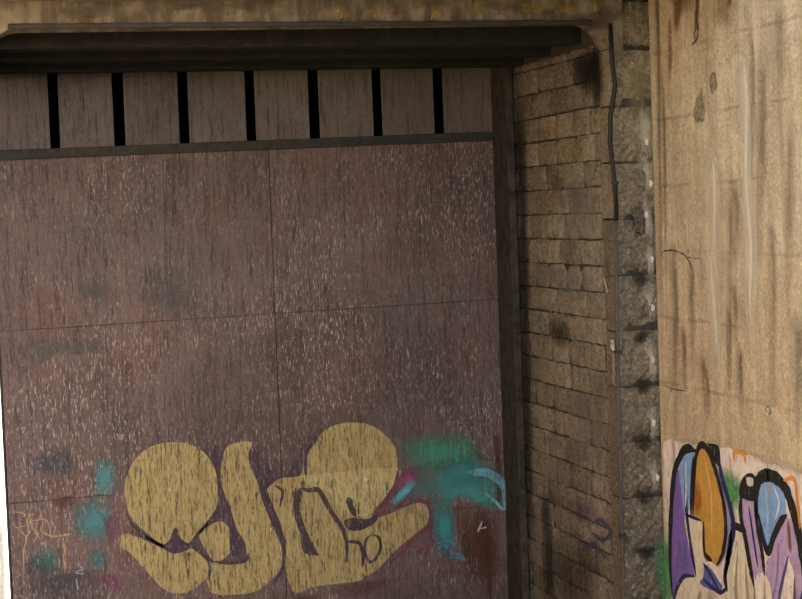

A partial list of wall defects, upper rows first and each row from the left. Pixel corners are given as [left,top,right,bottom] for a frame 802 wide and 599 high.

spalling [694,72,717,123]
leakage [701,160,719,346]
leakage [739,57,753,317]